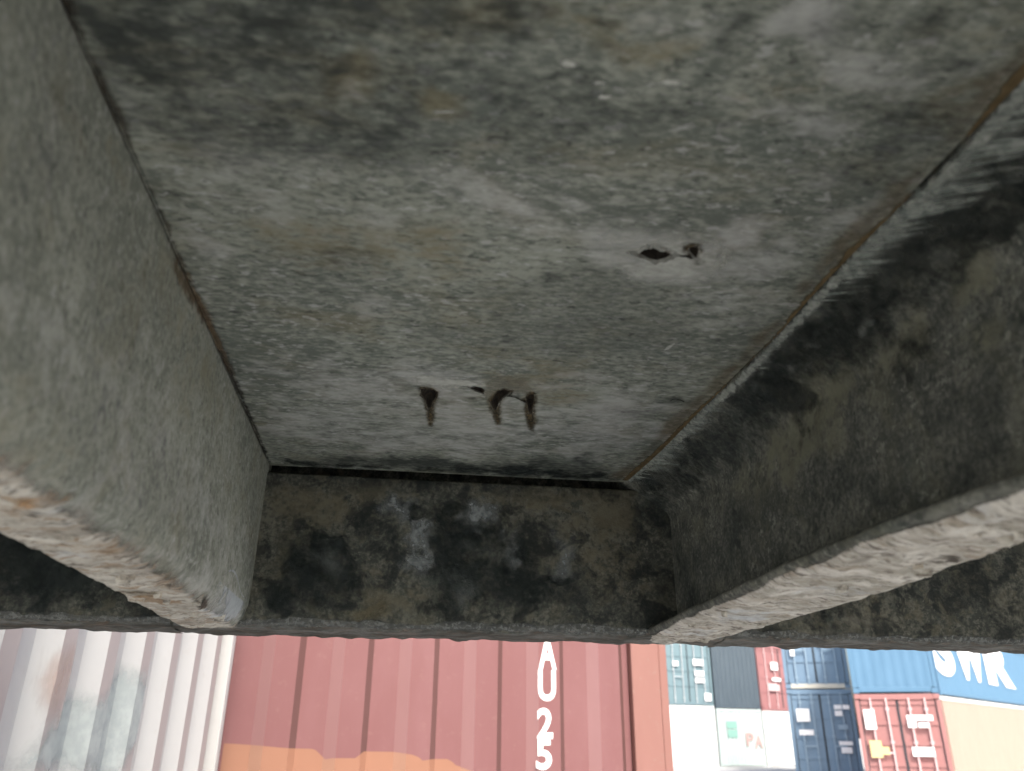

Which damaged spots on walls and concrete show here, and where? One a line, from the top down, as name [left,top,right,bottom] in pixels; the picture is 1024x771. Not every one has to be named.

damp [605,231,717,284]
spalling [628,242,702,265]
damp [628,80,1024,492]
rust [524,393,536,430]